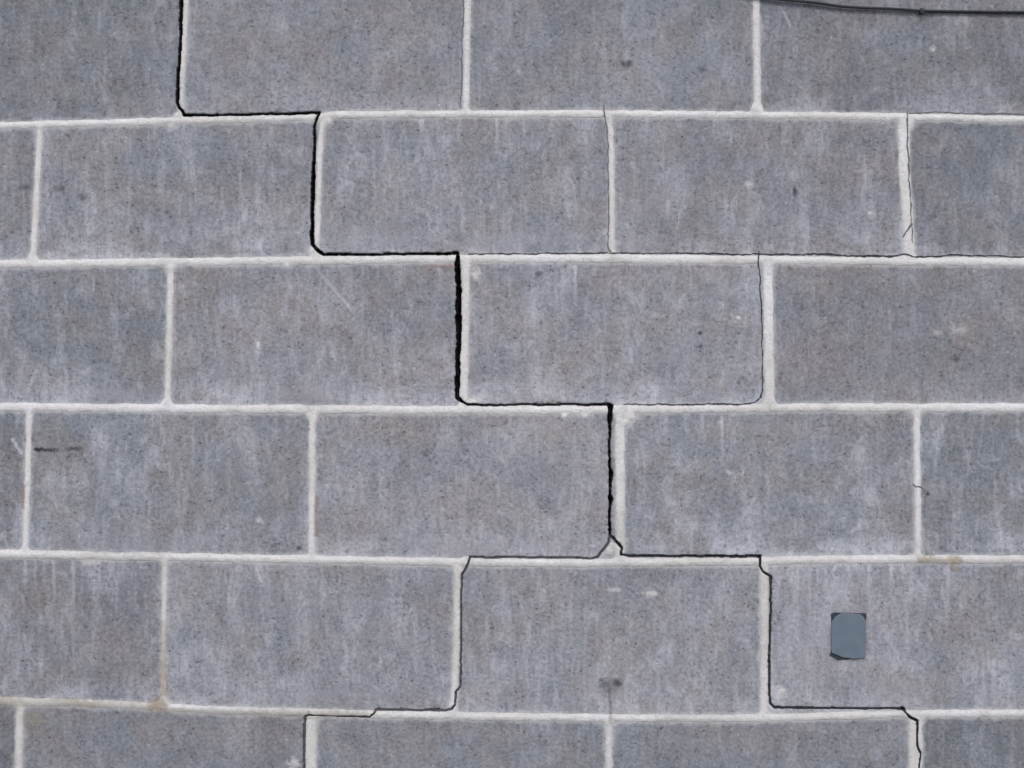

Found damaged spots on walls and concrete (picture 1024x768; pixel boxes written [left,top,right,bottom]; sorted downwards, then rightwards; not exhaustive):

crack [176,0,921,768]
crack [469,105,1024,406]